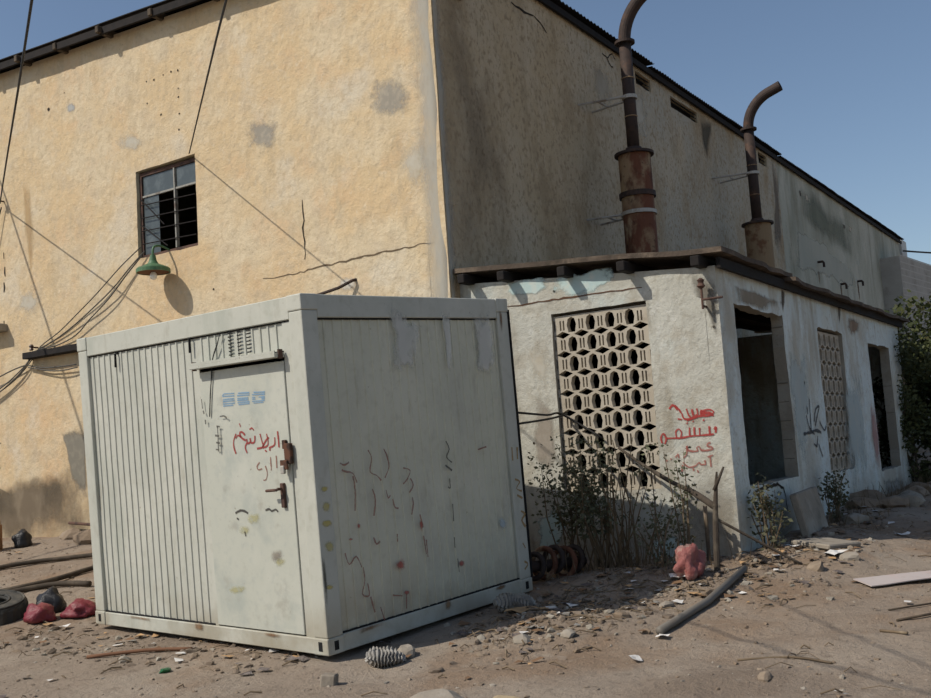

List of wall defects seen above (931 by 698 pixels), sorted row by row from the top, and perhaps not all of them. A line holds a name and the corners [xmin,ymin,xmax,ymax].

crack [263,201,431,279]
peeling [508,269,613,295]
water stain [0,481,77,537]